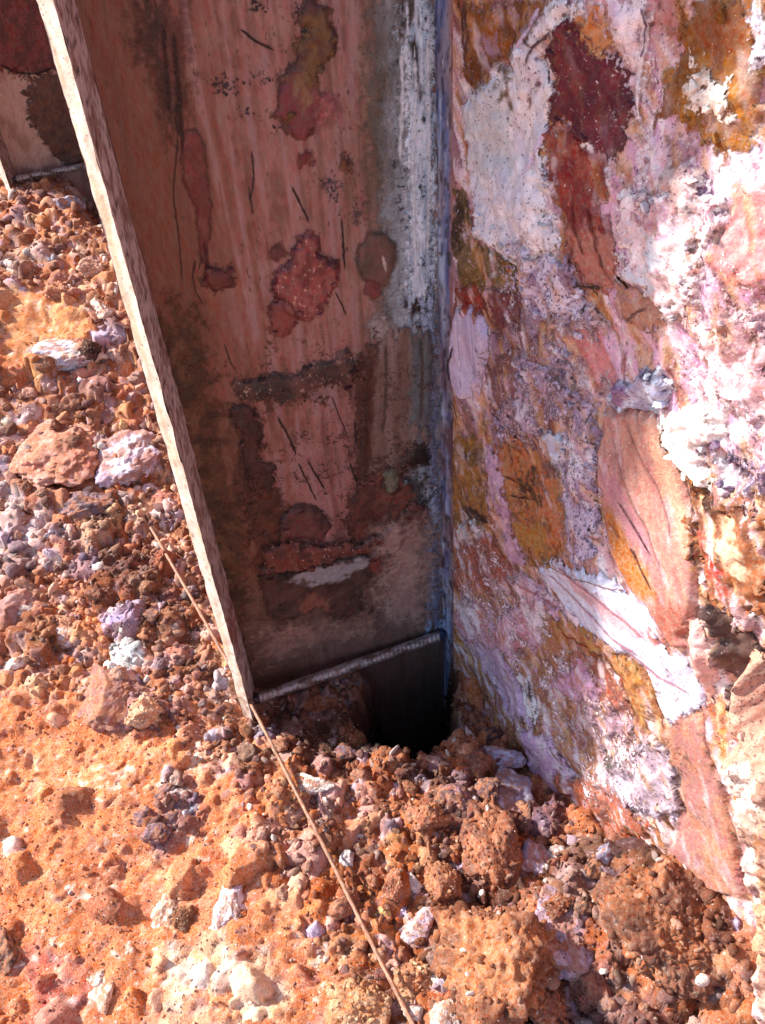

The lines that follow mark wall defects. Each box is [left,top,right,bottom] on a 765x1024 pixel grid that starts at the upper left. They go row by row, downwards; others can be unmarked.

peeling [270,0,340,141]
corrosion [180,129,237,295]
peeling [266,230,341,324]
leakage [158,0,765,831]
spalling [279,503,332,544]
spalling [258,552,379,624]